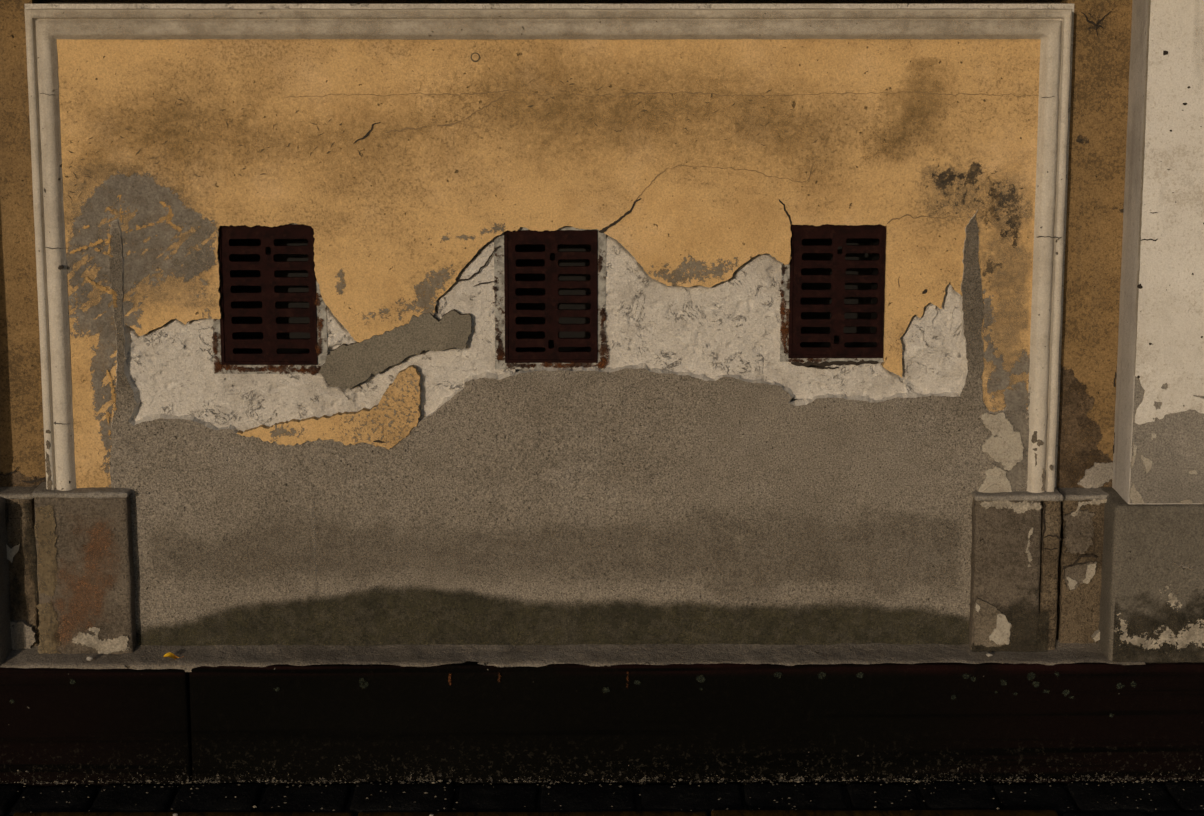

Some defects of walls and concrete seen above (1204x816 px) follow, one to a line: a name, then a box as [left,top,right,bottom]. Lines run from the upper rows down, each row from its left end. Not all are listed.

crack [68,78,1055,233]
water stain [983,169,1023,248]
rust [212,293,324,375]
spalling [58,171,515,488]
rust [492,280,610,369]
spalling [601,234,965,400]
rust [778,262,829,364]
peeling [978,289,1113,493]
peeling [1129,375,1204,504]
peeling [10,505,61,654]
water stain [72,499,969,654]
spalling [972,597,1012,647]